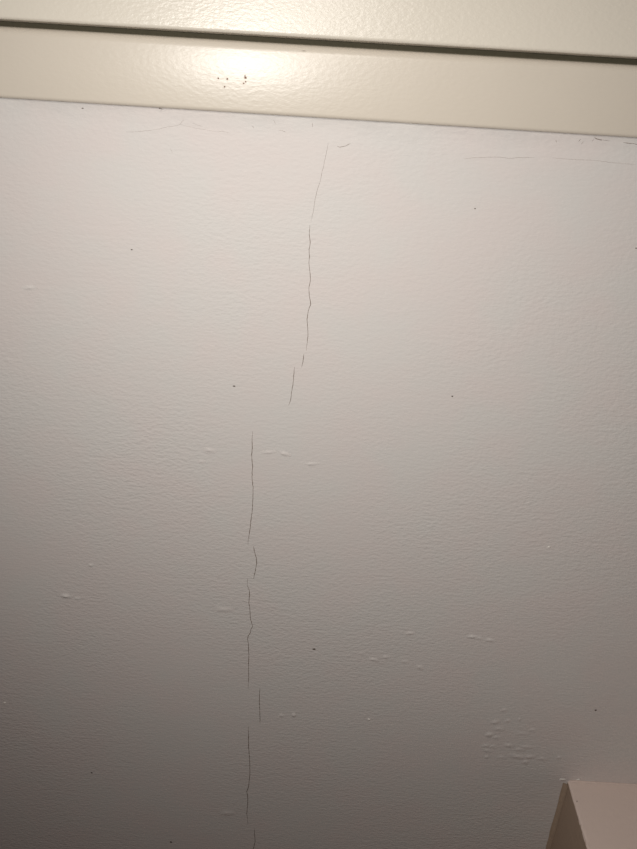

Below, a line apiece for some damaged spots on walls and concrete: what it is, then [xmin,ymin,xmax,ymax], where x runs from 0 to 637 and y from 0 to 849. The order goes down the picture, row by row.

crack [246,727,255,849]